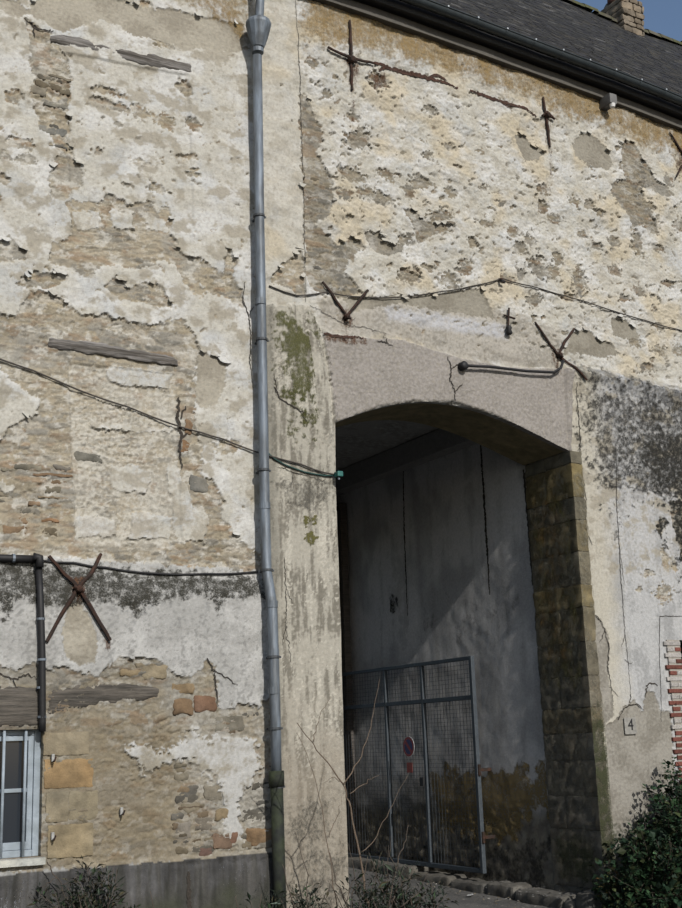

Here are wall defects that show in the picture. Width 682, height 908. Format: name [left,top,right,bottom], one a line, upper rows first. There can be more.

flaking render [0,0,261,572]